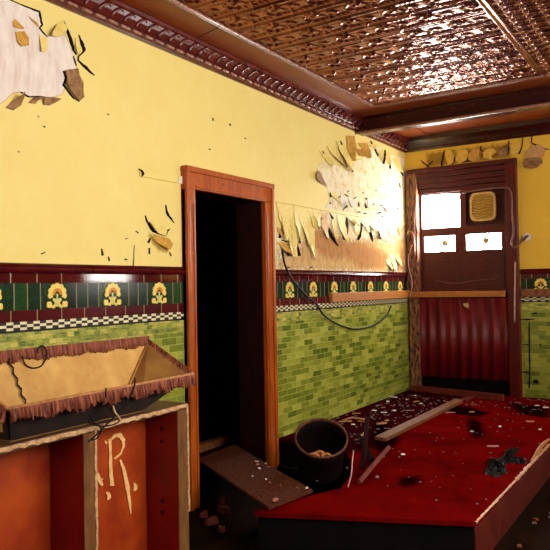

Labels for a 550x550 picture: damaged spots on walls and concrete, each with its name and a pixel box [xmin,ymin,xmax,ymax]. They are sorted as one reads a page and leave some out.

peeling [0,0,94,110]
peeling [150,221,173,251]
peeling [276,136,405,273]
peeling [445,142,546,169]